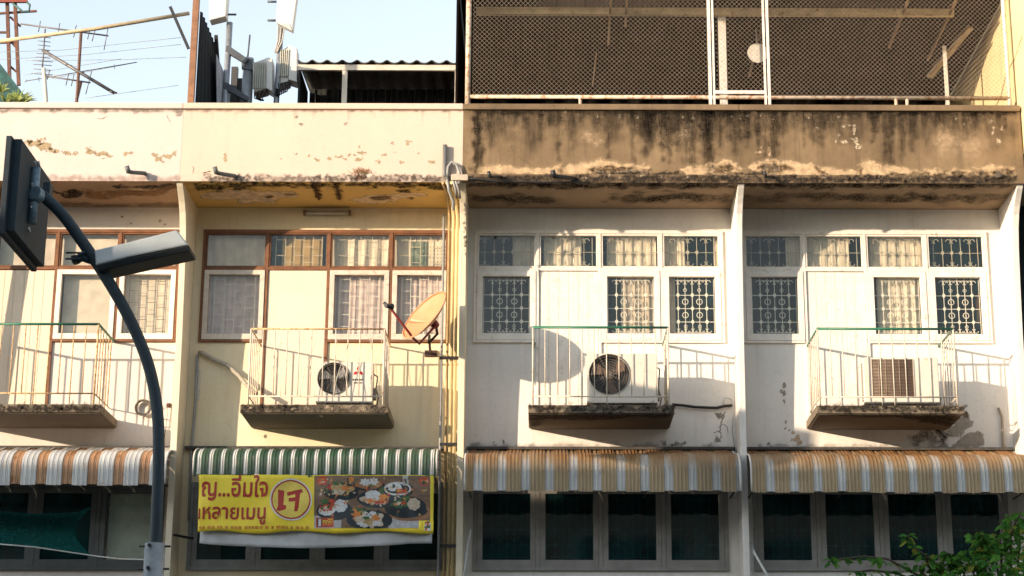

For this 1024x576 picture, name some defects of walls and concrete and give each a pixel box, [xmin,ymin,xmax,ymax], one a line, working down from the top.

peeling [24,137,133,159]
leakage [194,110,1017,204]
leakage [60,184,177,206]
peeling [952,431,984,447]